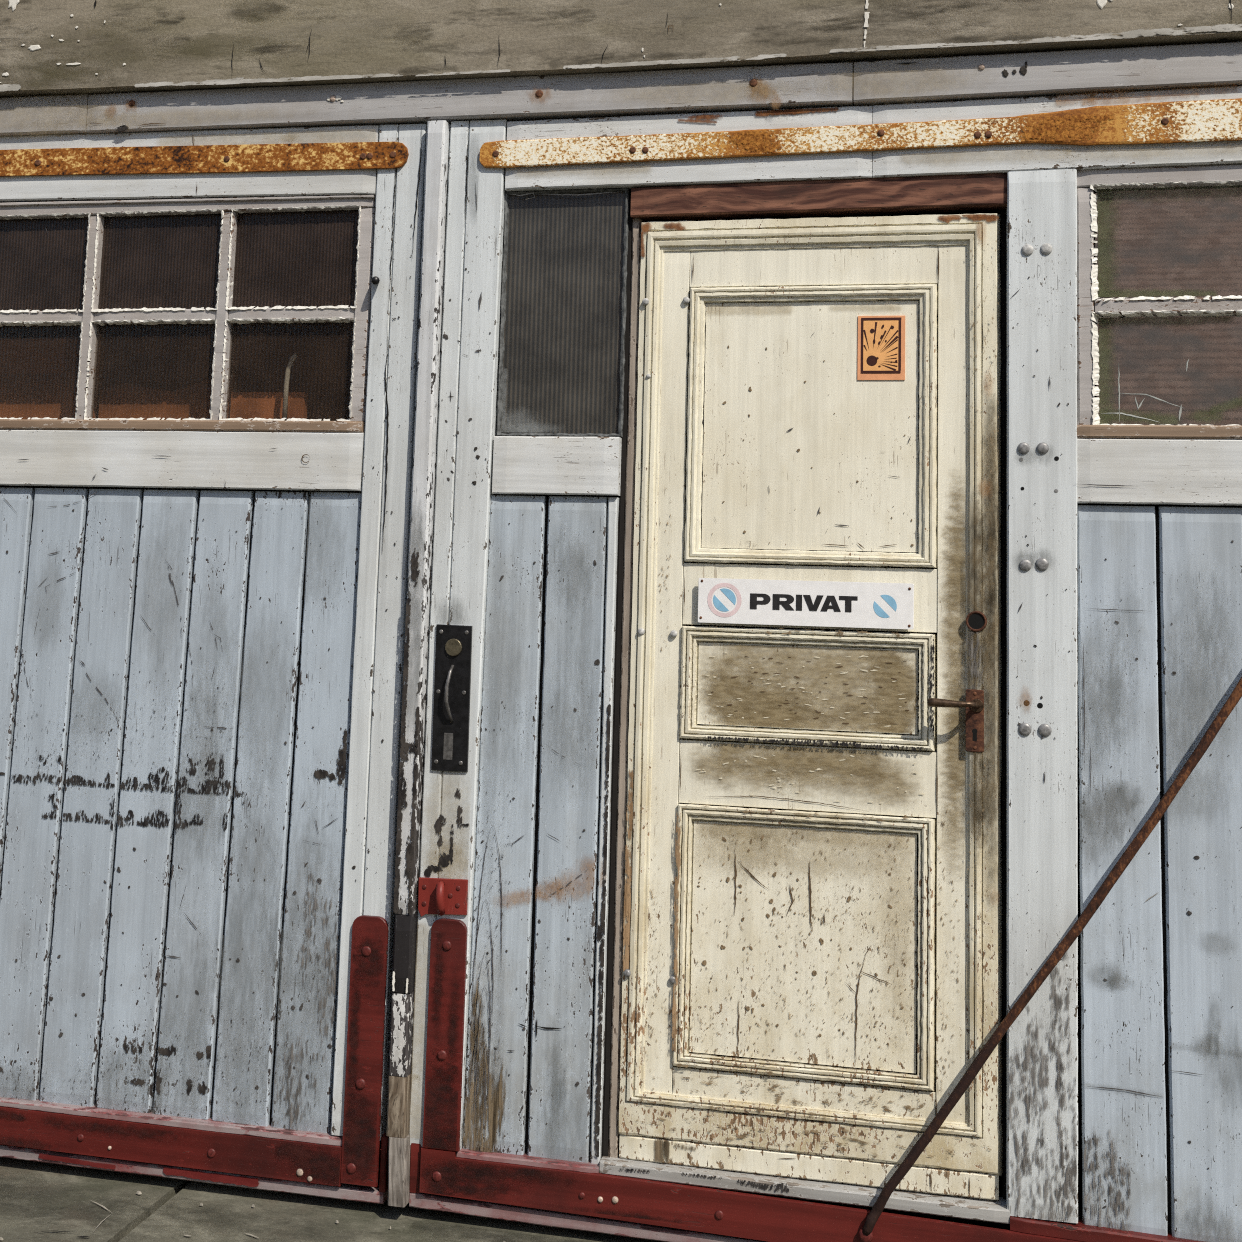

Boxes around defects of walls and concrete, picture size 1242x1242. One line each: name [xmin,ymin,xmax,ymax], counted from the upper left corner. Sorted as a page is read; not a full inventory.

peeling [0,72,21,92]
rust [730,130,782,153]
rust [1021,114,1114,142]
leakage [945,408,1000,844]
leakage [709,644,917,733]
peeling [0,687,247,833]
peeling [386,548,515,1153]
peeling [619,805,924,1173]
peeling [738,1179,789,1192]